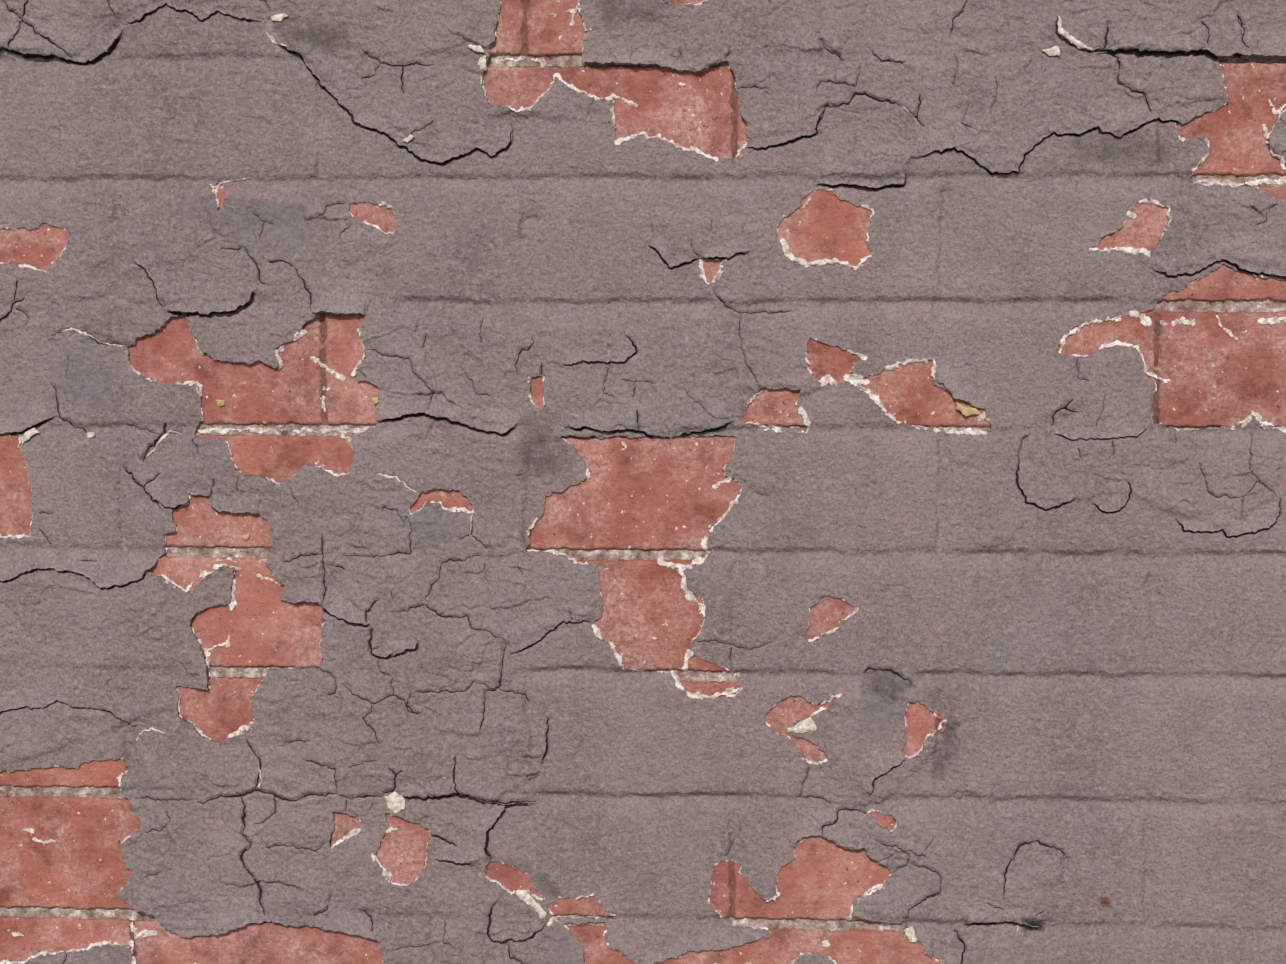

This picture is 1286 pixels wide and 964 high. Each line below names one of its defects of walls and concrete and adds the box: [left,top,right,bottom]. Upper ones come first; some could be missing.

crack [4,0,73,57]
peeling [0,0,822,166]
crack [816,39,922,123]
crack [1056,16,1210,110]
crack [220,213,311,309]
peeling [1054,199,1286,441]
crack [123,423,198,509]
peeling [0,247,522,741]
peeling [502,387,811,699]
crack [136,516,543,911]
peeling [0,754,393,964]
peeling [371,775,1047,964]